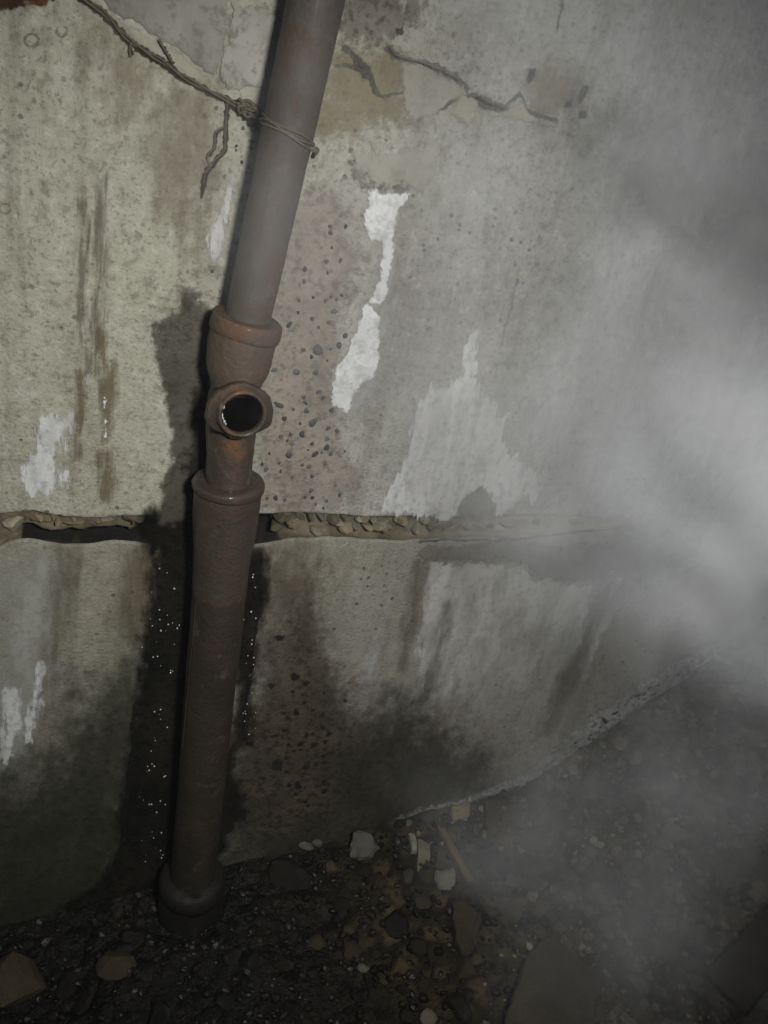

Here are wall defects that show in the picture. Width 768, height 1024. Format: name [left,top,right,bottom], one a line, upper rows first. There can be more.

crack [335,44,558,122]
rust [76,371,84,429]
water stain [78,194,103,343]
rust [97,453,113,500]
rust [98,330,115,426]
spalling [260,160,411,512]
peeling [381,327,549,521]
water stain [458,487,495,521]
water stain [0,293,210,927]
water stain [217,529,703,867]